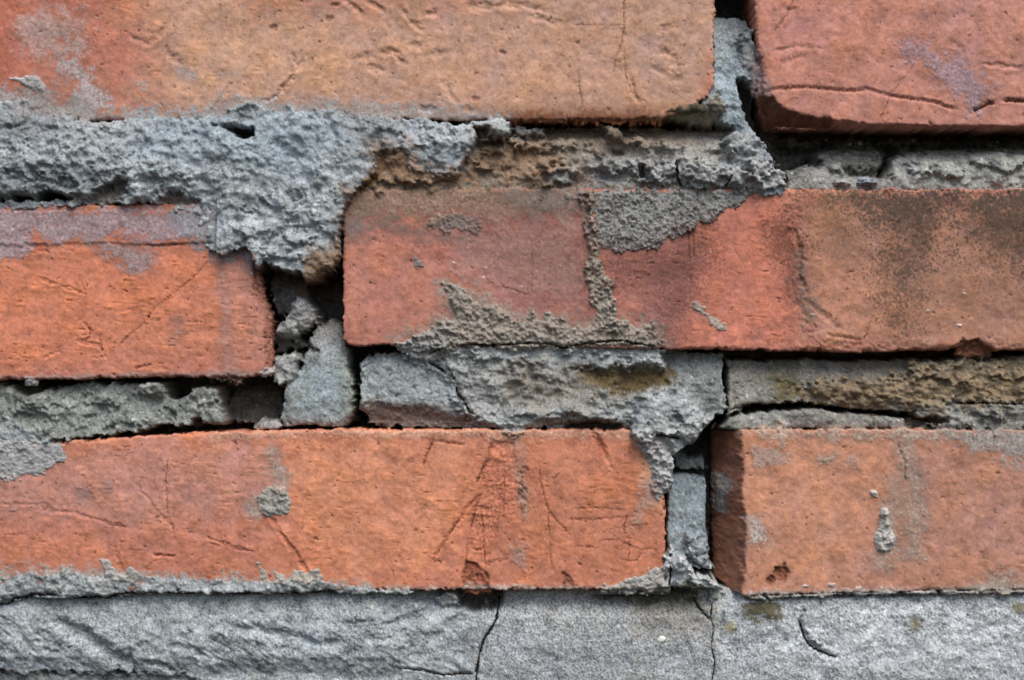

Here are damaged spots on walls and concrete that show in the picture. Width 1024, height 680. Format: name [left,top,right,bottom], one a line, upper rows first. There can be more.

crack [761,86,865,94]
crack [945,99,1024,112]
crack [674,160,682,186]
crack [400,593,501,680]
crack [799,621,836,657]